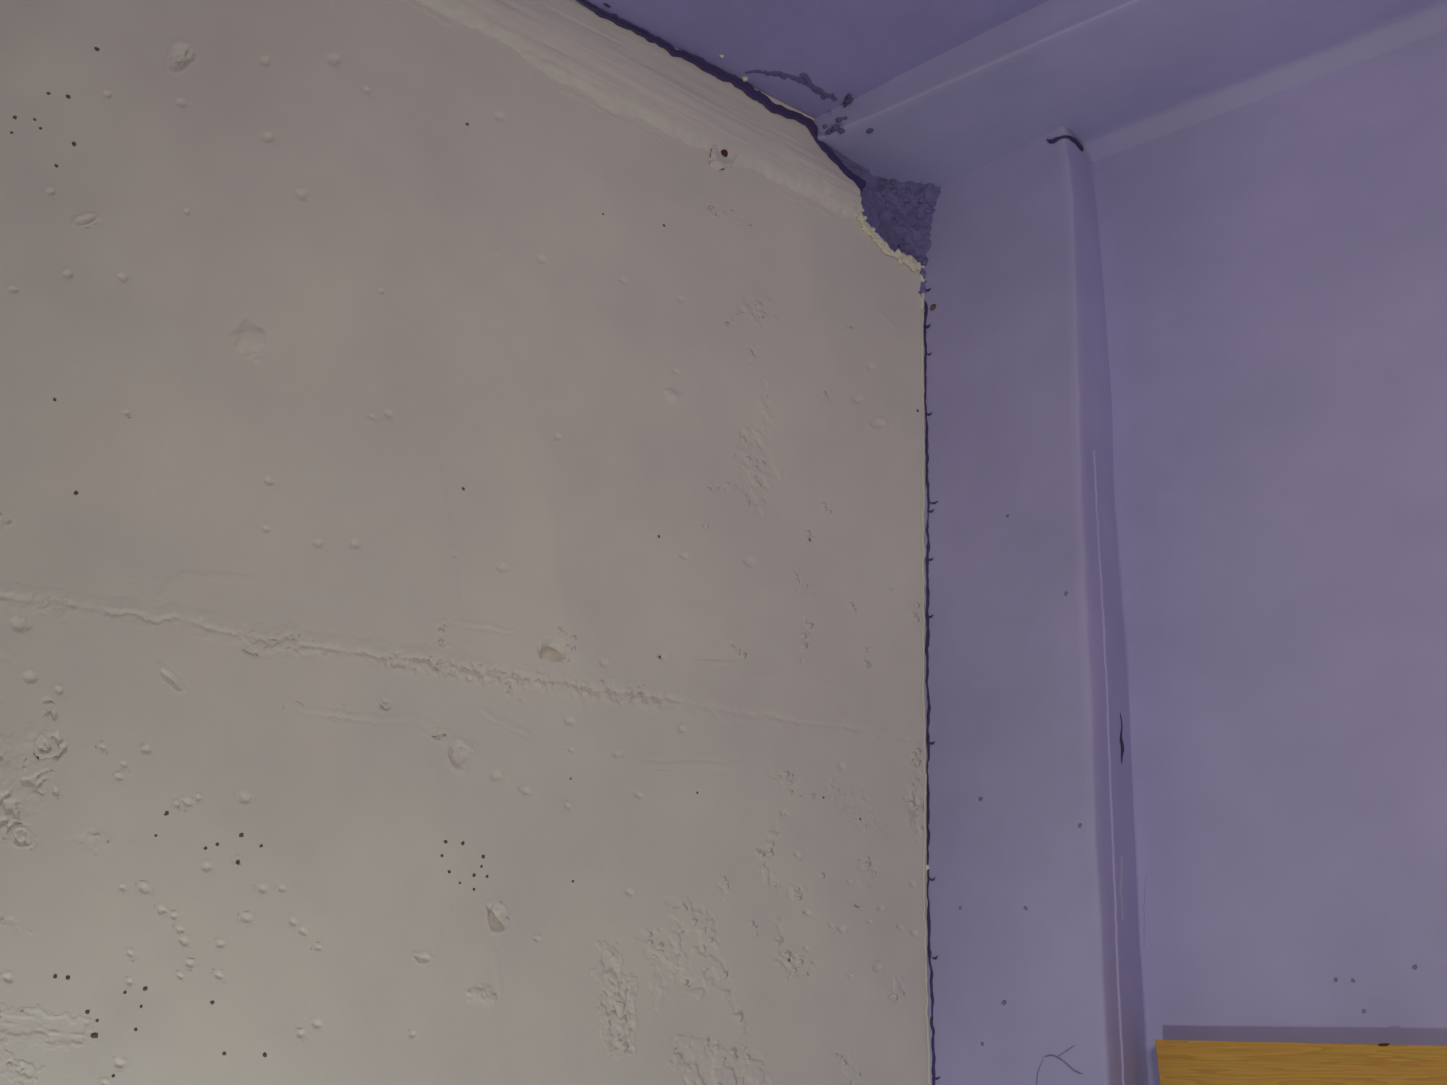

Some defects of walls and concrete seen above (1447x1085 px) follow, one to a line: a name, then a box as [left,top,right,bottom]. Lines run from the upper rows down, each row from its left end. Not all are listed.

peeling [745,70,852,107]
flaking render [836,155,942,310]
crack [923,288,940,1085]